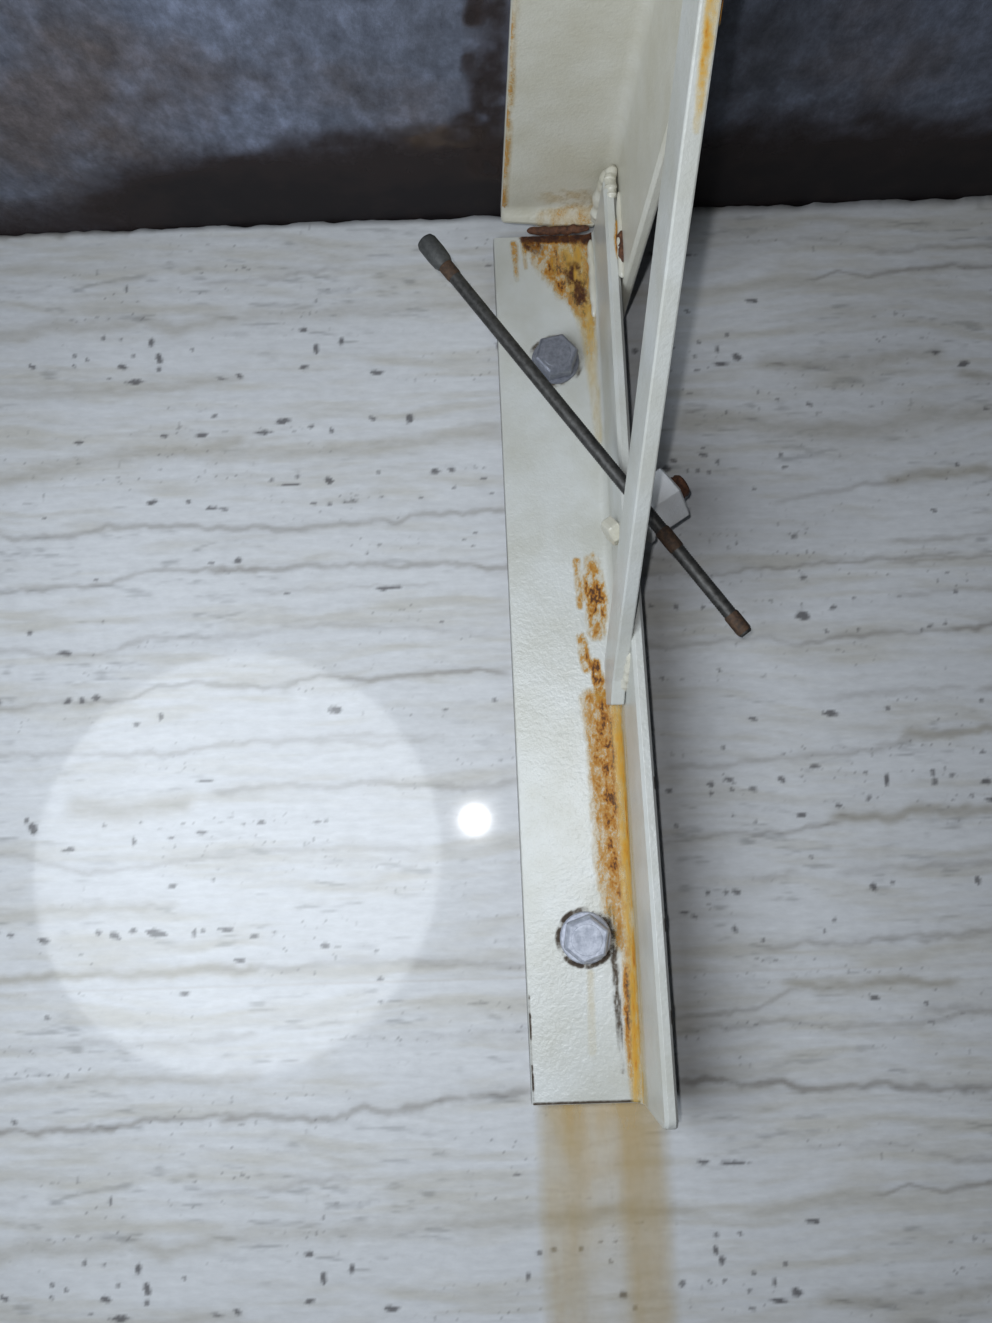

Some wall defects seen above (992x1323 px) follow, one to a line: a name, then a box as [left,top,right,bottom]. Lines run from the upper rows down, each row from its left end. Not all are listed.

corrosion [511,206,594,353]
corrosion [573,555,644,1104]